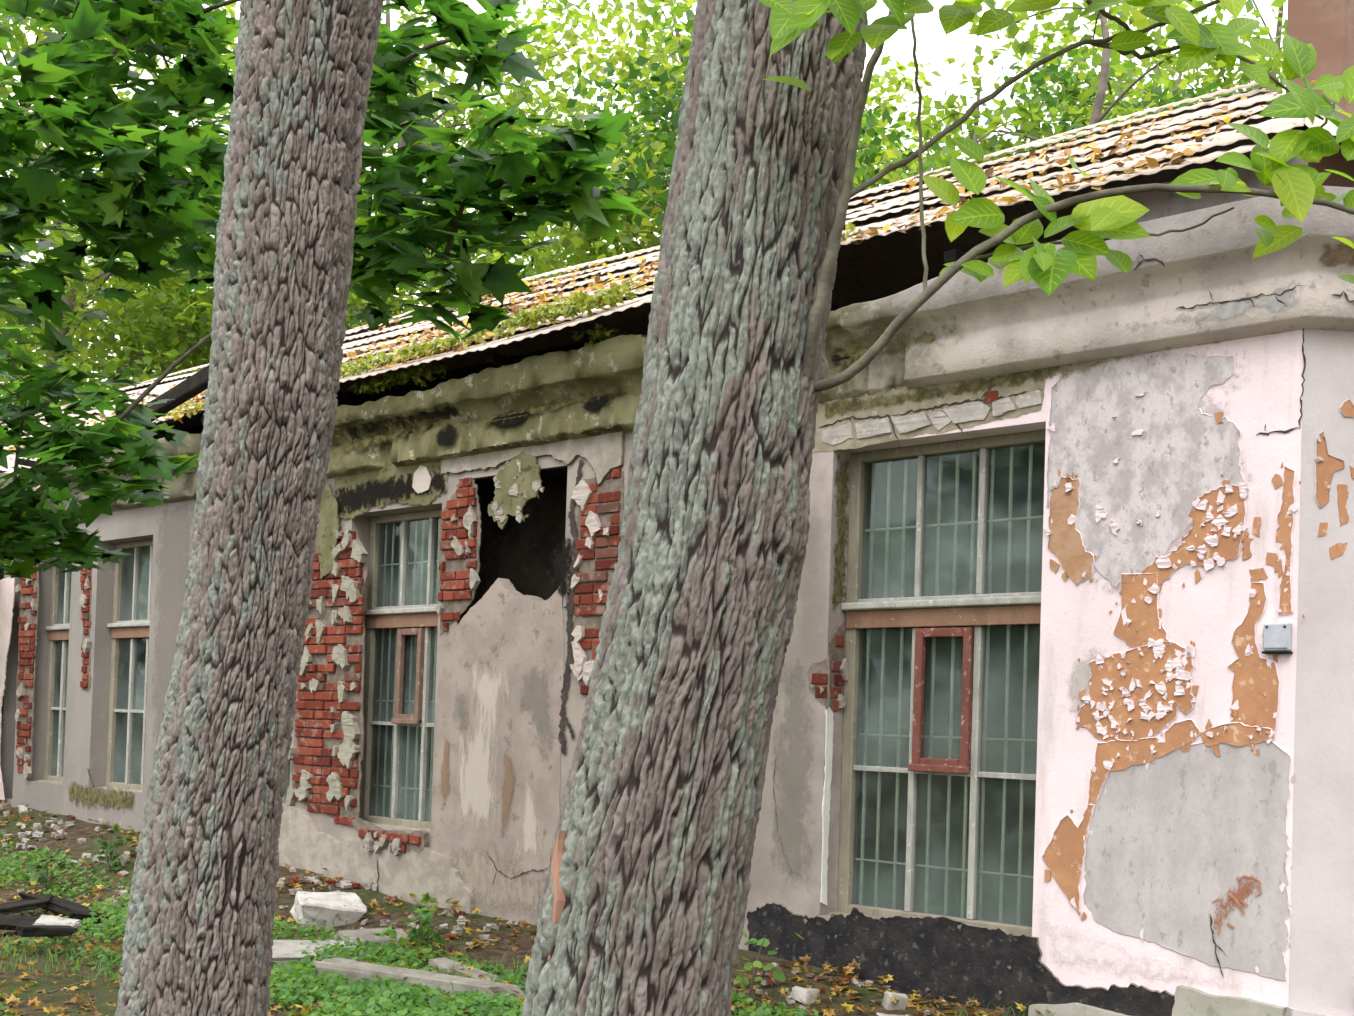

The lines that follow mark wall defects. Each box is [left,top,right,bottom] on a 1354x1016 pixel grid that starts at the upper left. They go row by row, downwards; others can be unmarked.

crack [1176,285,1306,435]
crack [1332,291,1354,305]
damp [343,418,430,453]
damp [335,471,445,515]
damp [498,423,622,451]
flaking render [15,564,39,779]
flaking render [78,568,92,691]
flaking render [285,406,625,856]
peeling [813,351,1354,981]
flaking render [746,620,1175,1016]